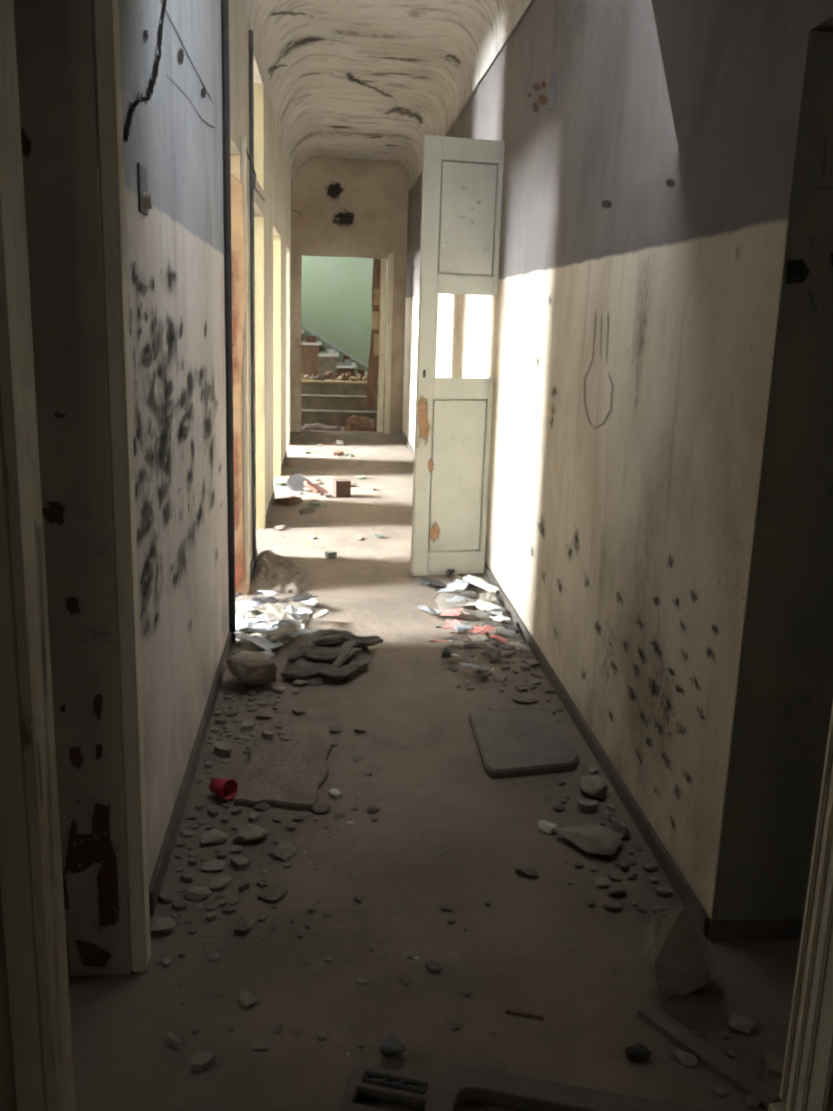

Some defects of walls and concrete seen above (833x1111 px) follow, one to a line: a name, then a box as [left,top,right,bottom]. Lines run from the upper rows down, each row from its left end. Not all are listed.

crack [123,0,215,142]
spalling [327,183,355,226]
leakage [133,265,154,295]
spalling [786,259,809,284]
peeling [417,397,431,445]
leakage [129,308,221,633]
peeling [429,522,440,543]
peeling [62,798,120,976]